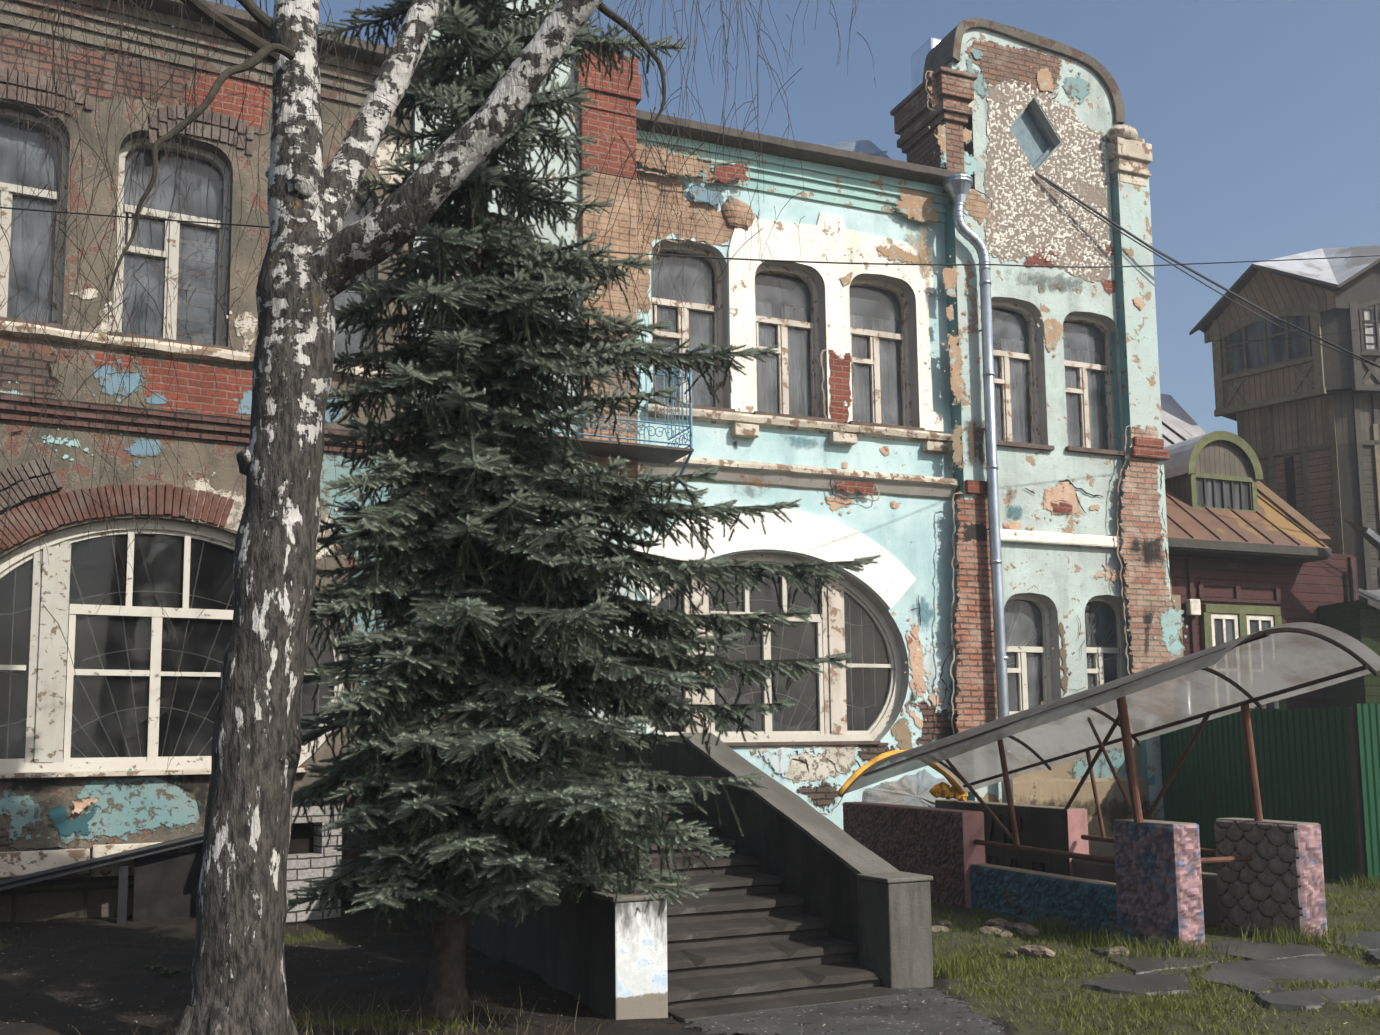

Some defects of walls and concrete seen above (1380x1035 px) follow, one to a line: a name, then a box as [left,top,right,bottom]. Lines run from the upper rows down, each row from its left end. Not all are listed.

spalling [636,138,750,313]
flaking render [890,187,944,231]
spalling [0,346,253,419]
spalling [820,349,855,424]
flaking render [876,244,979,473]
flaking render [822,462,900,516]
spalling [853,425,1188,772]
flaking render [1013,742,1141,780]
peeling [70,786,100,825]
spalling [797,781,843,815]
spalling [862,769,957,808]